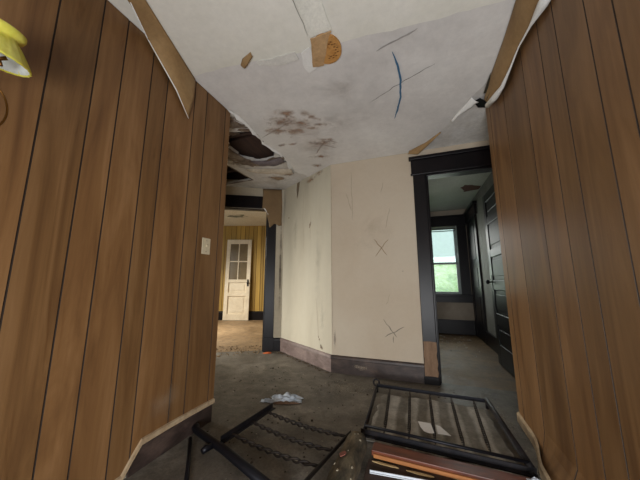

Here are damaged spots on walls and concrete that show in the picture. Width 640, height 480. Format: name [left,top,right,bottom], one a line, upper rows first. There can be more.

flaking render [230,121,250,132]